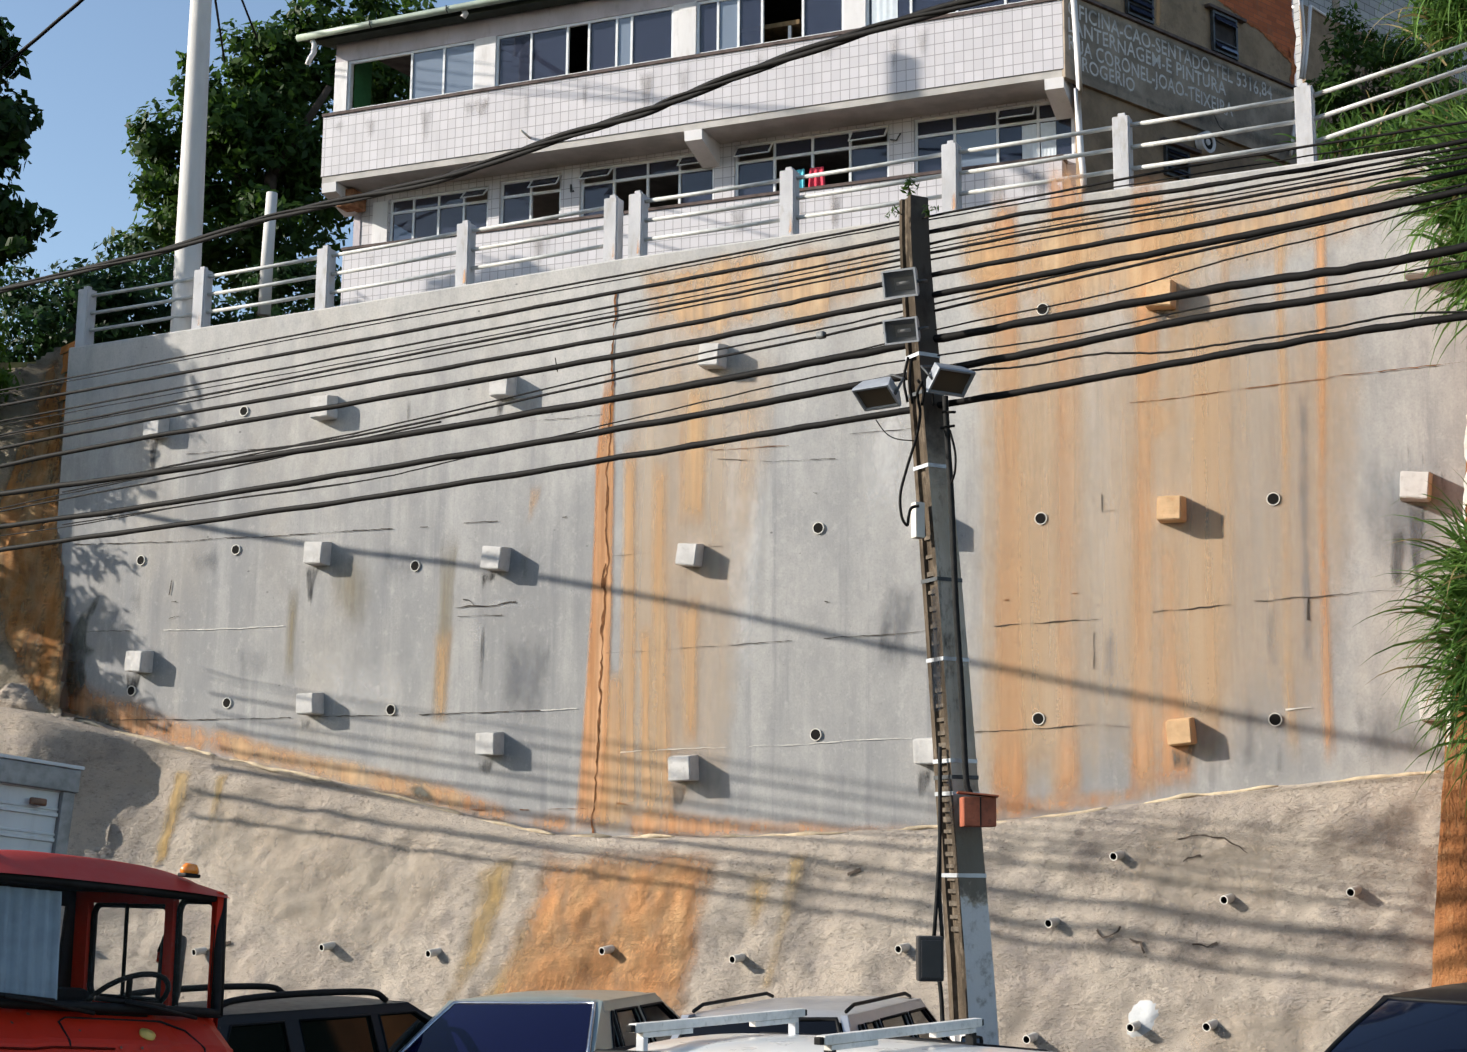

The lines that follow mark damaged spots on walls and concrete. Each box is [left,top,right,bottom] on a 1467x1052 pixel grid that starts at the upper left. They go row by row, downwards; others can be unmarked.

corrosion [156,773,186,862]
corrosion [0,365,504,818]
crack [77,294,921,833]
corrosion [497,857,707,1008]
corrosion [579,388,760,835]
corrosion [970,177,1368,814]
crack [1178,834,1247,862]